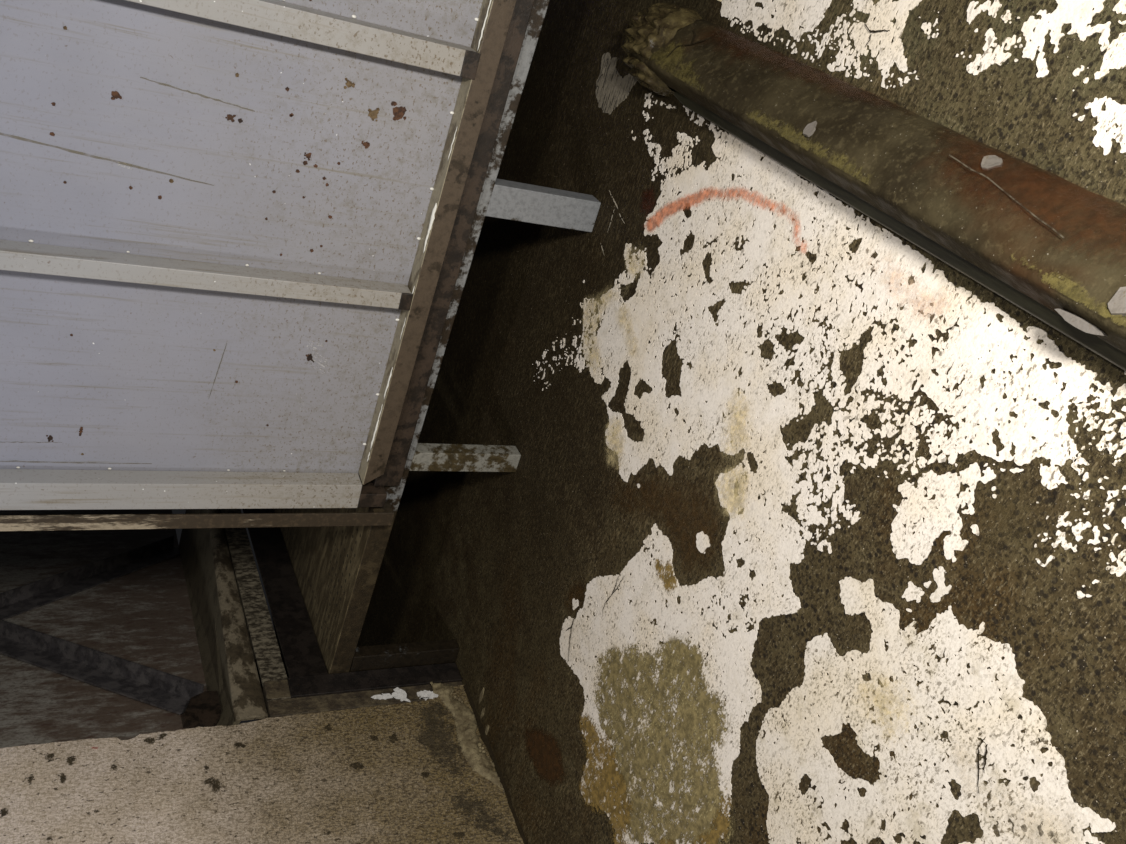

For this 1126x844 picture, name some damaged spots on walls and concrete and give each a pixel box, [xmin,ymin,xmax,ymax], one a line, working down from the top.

peeling [718,0,939,89]
peeling [956,0,1126,92]
rust [140,77,254,123]
rust [368,101,407,122]
peeling [596,52,638,115]
rust [12,132,208,184]
rust [641,189,798,236]
peeling [532,93,1126,844]
leakage [579,639,733,844]